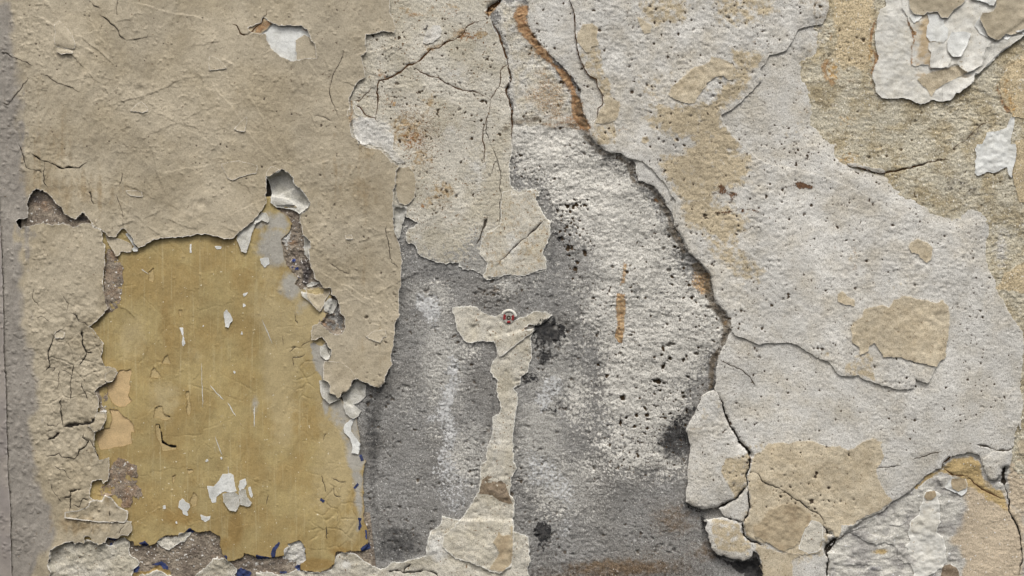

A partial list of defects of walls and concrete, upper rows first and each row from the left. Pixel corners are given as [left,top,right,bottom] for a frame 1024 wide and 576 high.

crack [317,0,513,244]
rust [513,5,591,131]
crack [852,122,987,174]
spalling [21,0,761,576]
rust [615,264,627,343]
spalling [799,0,1024,576]
crack [32,290,124,533]
crack [717,398,836,576]
crack [878,445,1023,572]